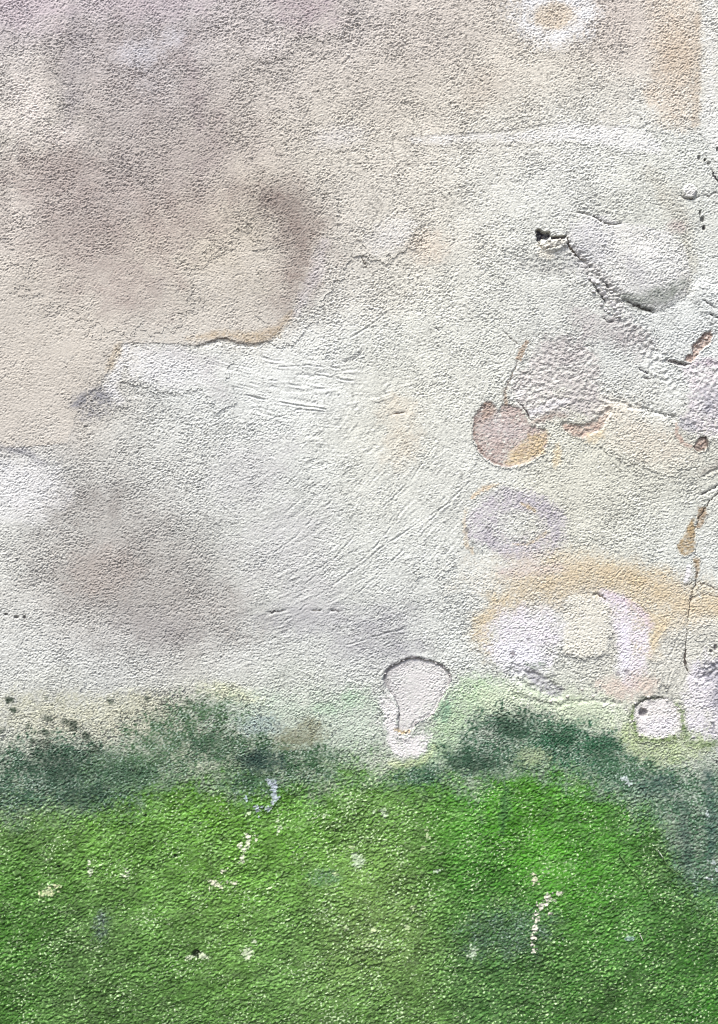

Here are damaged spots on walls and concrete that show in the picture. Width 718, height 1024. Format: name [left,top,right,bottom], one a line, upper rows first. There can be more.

spalling [502,325,613,428]
crack [676,455,718,674]
peeling [377,652,452,772]
spalling [627,693,687,745]
damp [669,763,718,887]